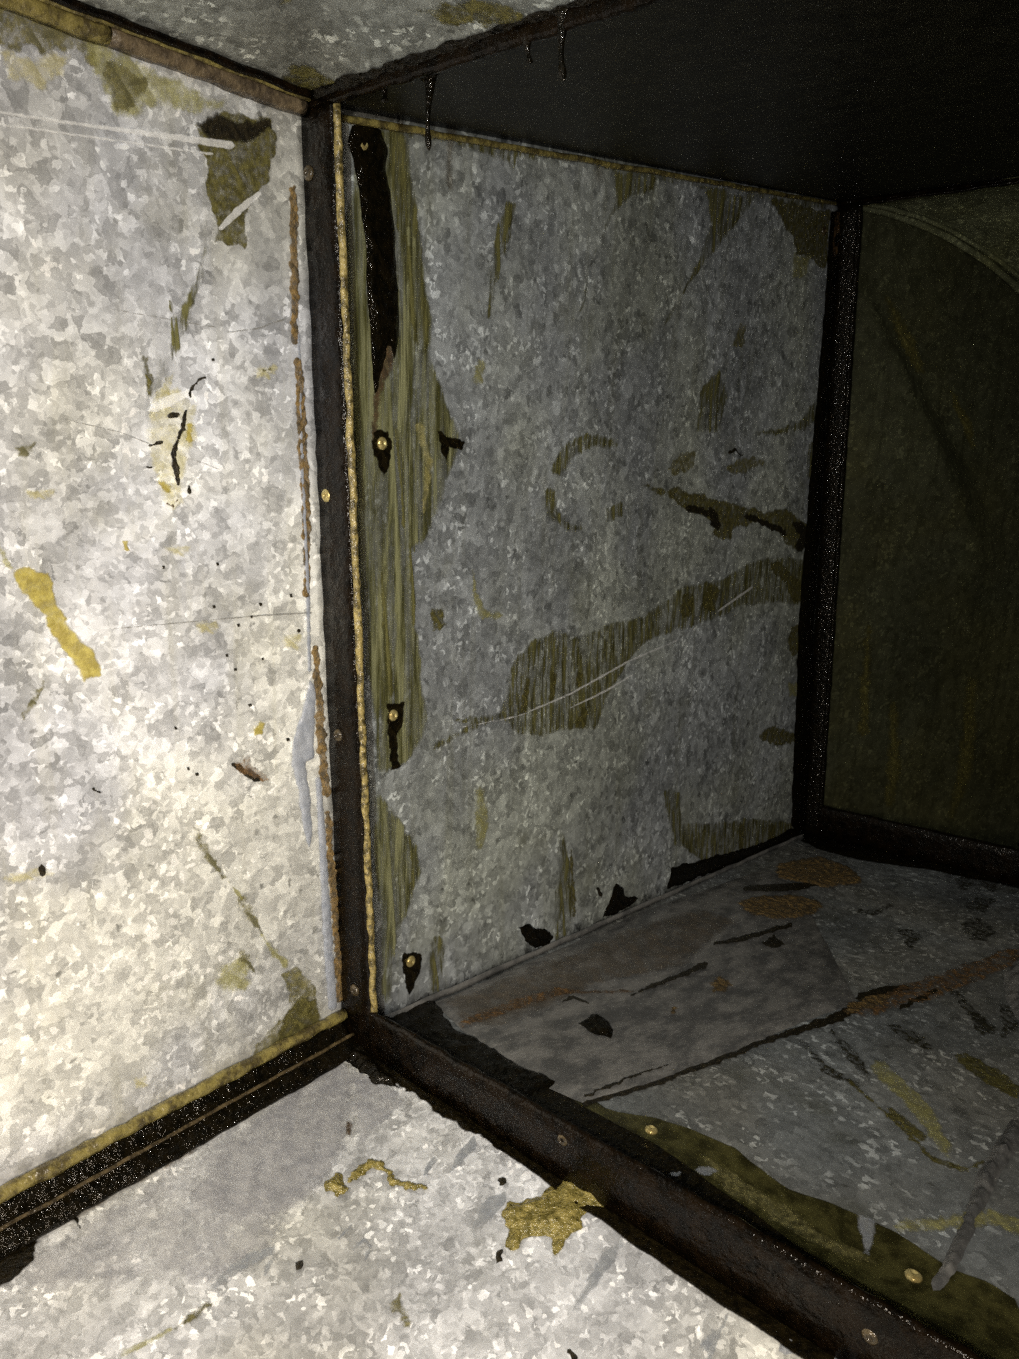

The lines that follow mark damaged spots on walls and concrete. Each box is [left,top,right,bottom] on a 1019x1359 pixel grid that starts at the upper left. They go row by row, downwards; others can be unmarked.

water stain [198,113,271,142]
rust [288,185,312,597]
water stain [744,514,806,552]
water stain [549,672,557,702]
rust [311,645,343,1003]